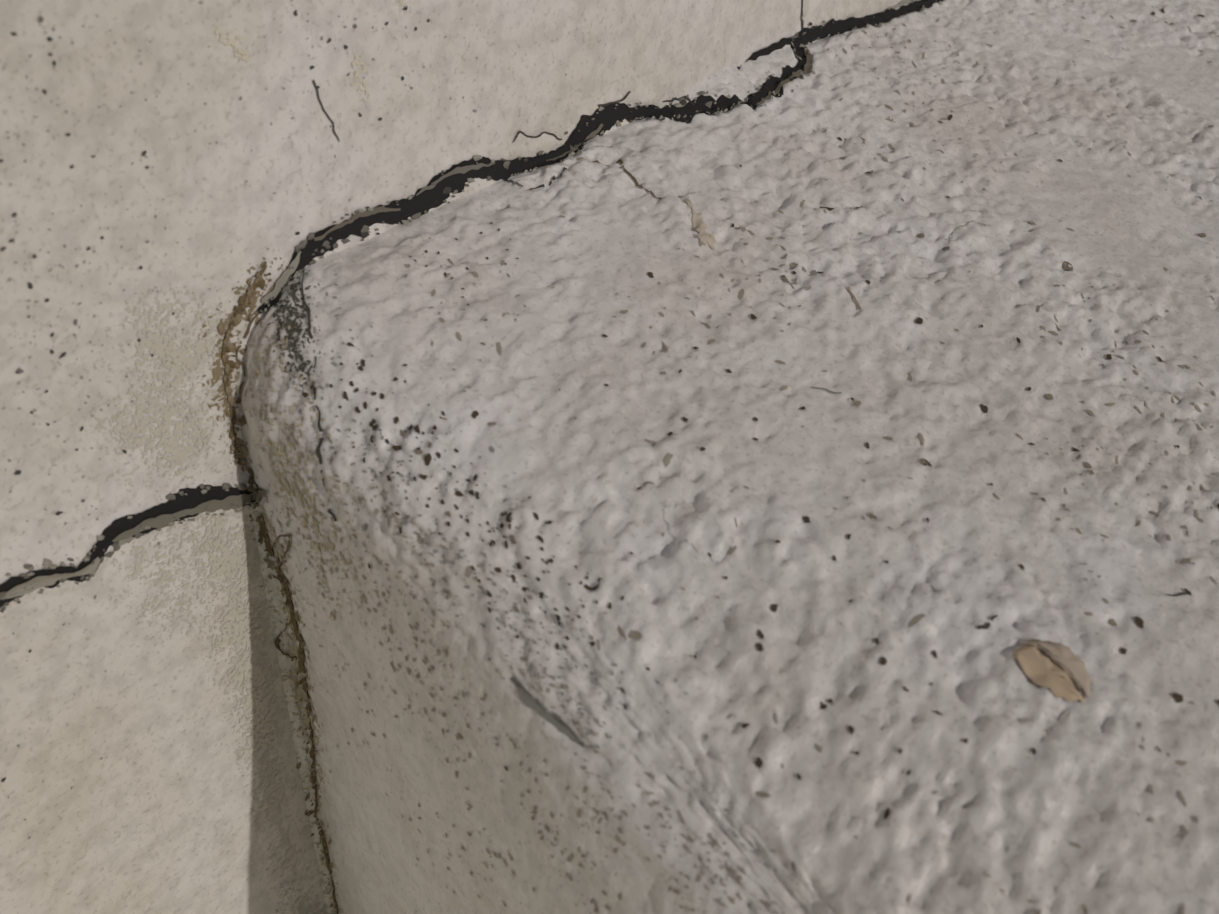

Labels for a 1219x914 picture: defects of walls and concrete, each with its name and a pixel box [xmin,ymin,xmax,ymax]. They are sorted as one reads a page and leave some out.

crack [948,220,990,242]
water stain [84,278,249,497]
crack [0,0,943,914]
water stain [109,506,336,914]
crack [977,615,998,629]